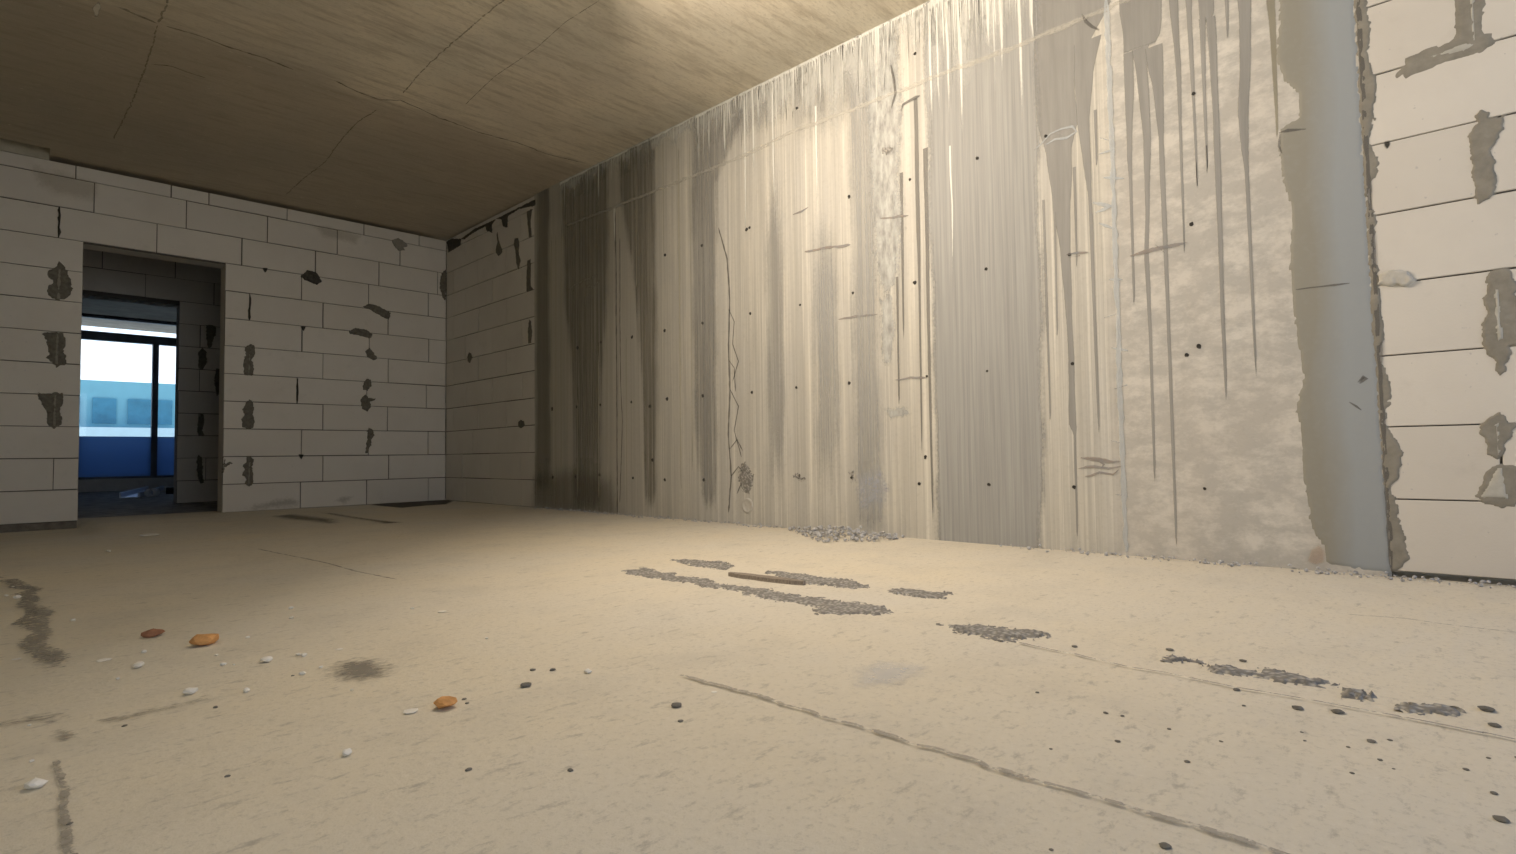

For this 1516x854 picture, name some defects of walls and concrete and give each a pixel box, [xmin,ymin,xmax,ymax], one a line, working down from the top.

crack [719,230,743,512]
leakage [551,0,1278,548]